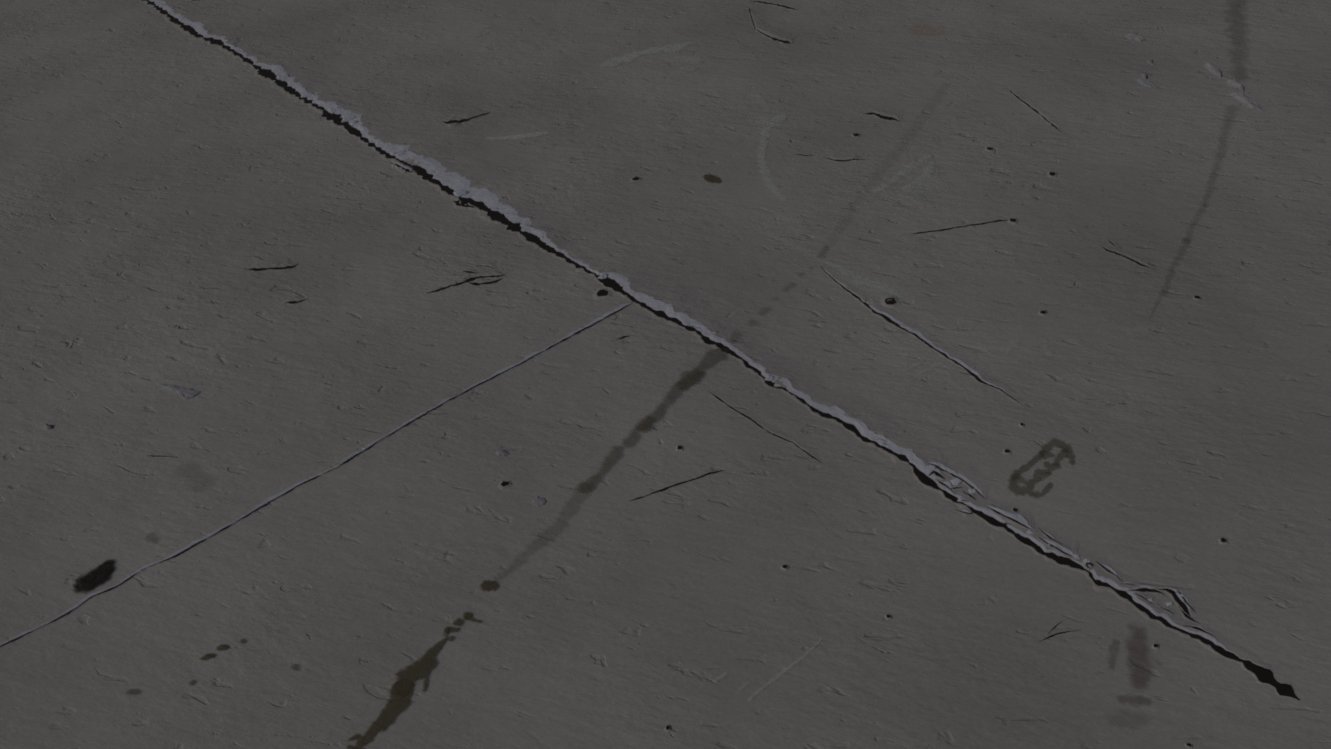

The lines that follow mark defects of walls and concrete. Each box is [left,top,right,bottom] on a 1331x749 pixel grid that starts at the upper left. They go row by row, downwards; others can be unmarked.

crack [140,0,1067,557]
crack [1100,238,1157,270]
crack [0,302,633,647]
leakage [347,637,448,749]
crack [778,386,1300,701]